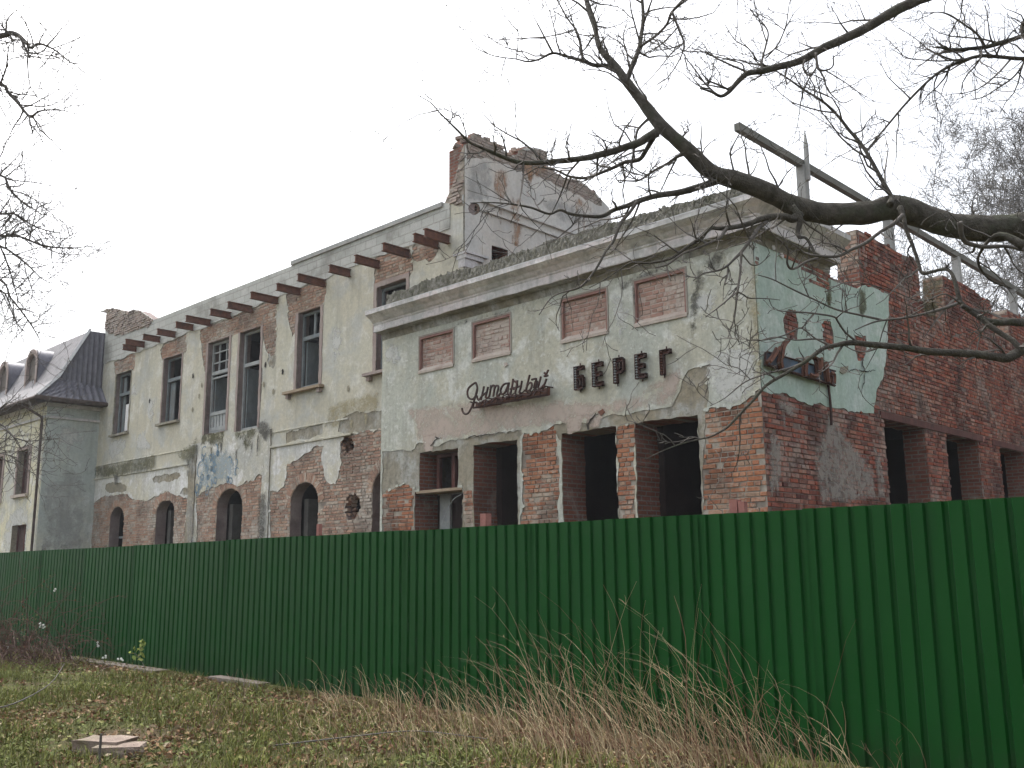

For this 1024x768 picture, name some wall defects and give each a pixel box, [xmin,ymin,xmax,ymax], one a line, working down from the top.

spalling [445,134,601,207]
spalling [783,307,800,339]
spalling [821,320,834,351]
spalling [91,349,768,548]